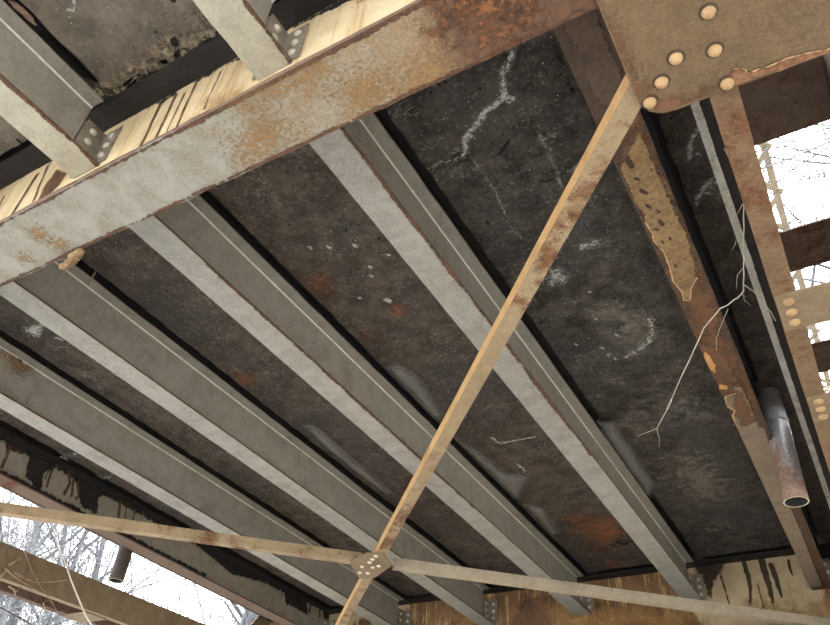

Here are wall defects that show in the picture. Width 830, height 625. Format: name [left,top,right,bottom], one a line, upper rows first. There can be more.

peeling [564,9,622,106]
rust [0,0,585,328]
crack [433,51,518,234]
peeling [620,113,822,588]
rust [505,343,593,456]
leakage [0,434,168,526]
leakage [118,532,207,577]
leakage [192,543,312,615]
rust [512,589,704,625]
leakage [696,564,730,604]
leakage [742,559,783,607]